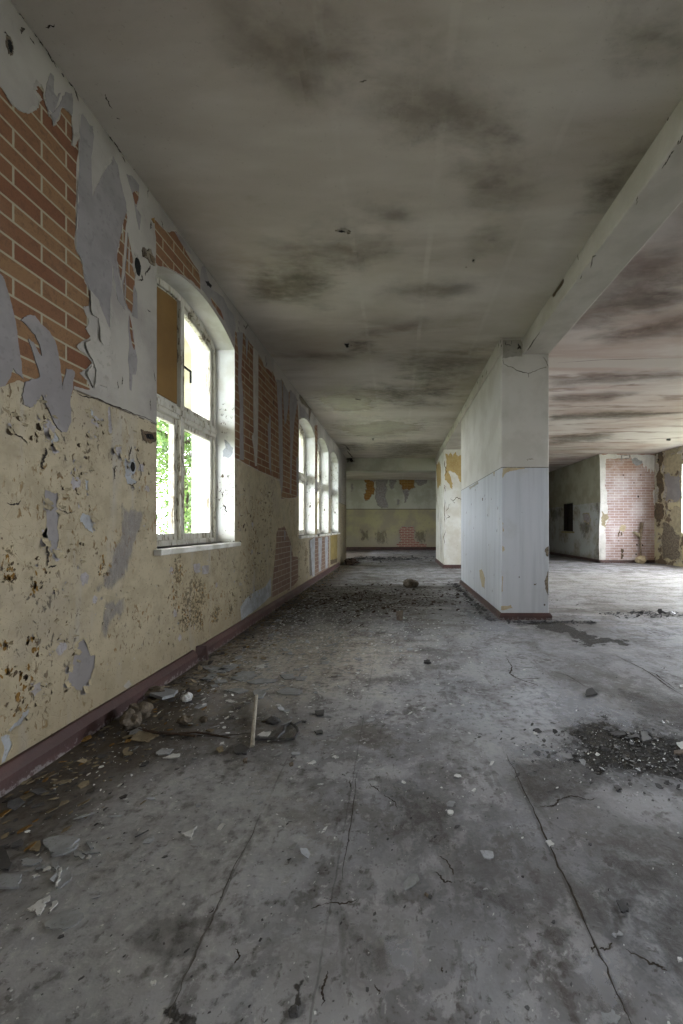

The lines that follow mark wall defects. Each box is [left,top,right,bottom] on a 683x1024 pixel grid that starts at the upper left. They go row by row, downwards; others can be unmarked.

flaking render [132,247,156,281]
crack [503,332,626,377]
peeling [5,395,105,598]
peeling [111,428,157,512]
peeling [436,452,479,490]
peeling [582,438,683,561]
peeling [22,565,197,721]
leakage [528,621,629,647]
crack [168,818,259,1023]
crack [506,754,667,1023]
crack [320,971,328,1006]